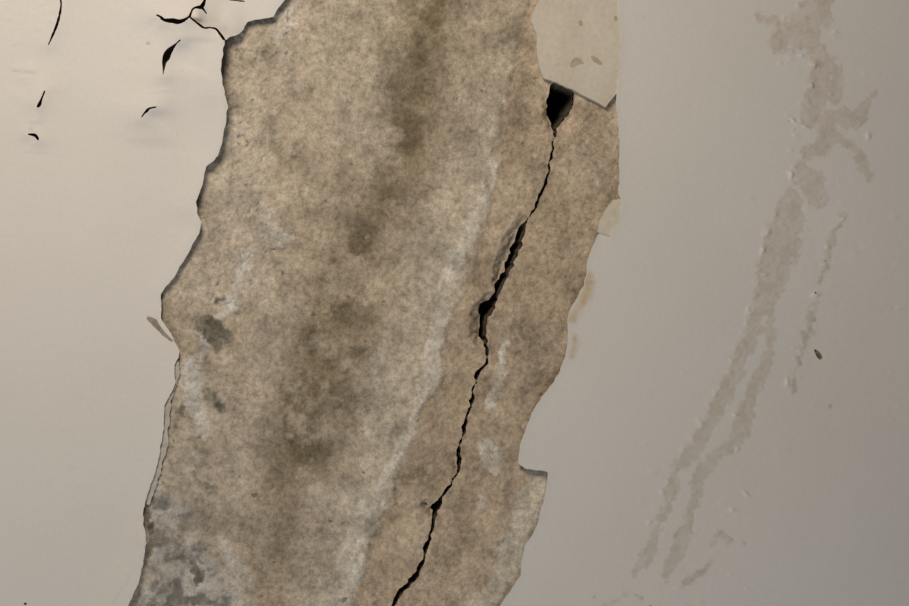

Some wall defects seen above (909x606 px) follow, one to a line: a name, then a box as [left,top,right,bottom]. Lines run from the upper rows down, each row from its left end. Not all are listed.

peeling [101,0,389,606]
peeling [296,0,622,606]
crack [391,83,574,606]
water stain [628,0,880,589]